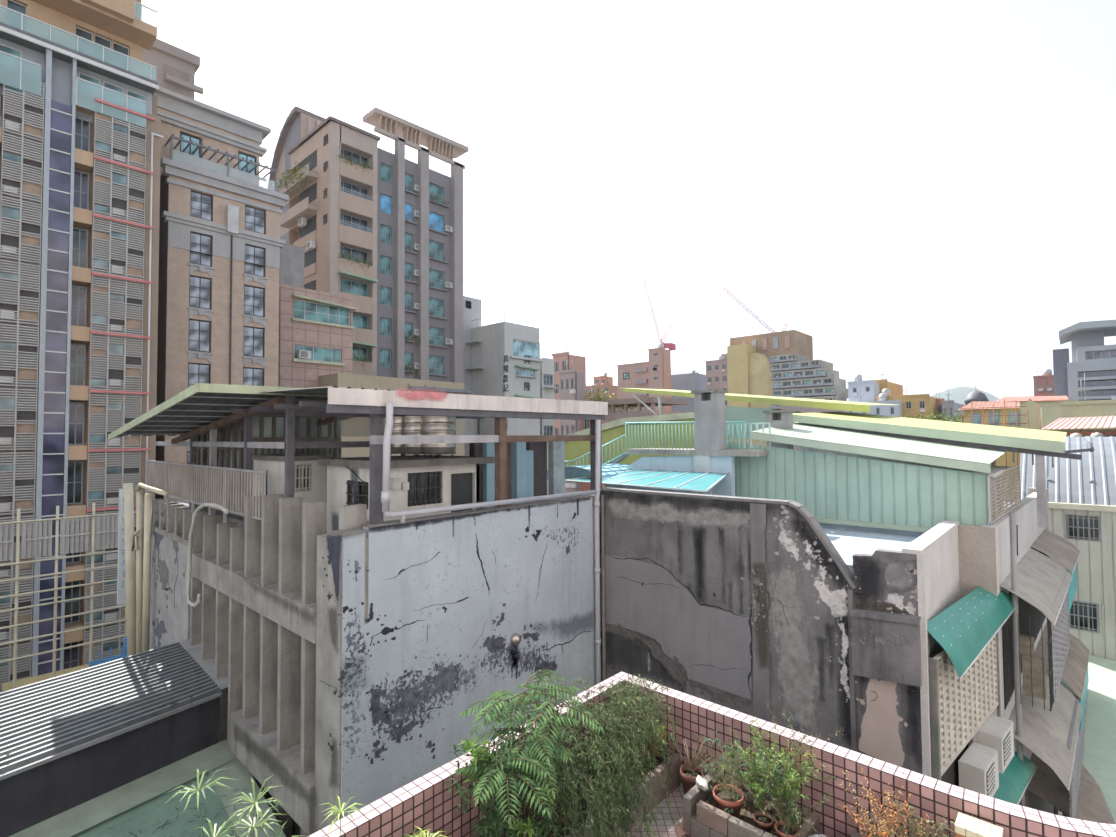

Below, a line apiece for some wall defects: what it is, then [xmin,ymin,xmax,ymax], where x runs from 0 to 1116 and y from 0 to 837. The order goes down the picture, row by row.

peeling [322,546,401,698]
peeling [365,654,463,764]
crack [370,515,496,646]
water stain [335,614,560,762]
crack [542,630,593,653]
water stain [367,491,905,742]
crack [607,509,796,698]
peeling [766,505,909,767]
peeling [876,552,926,615]